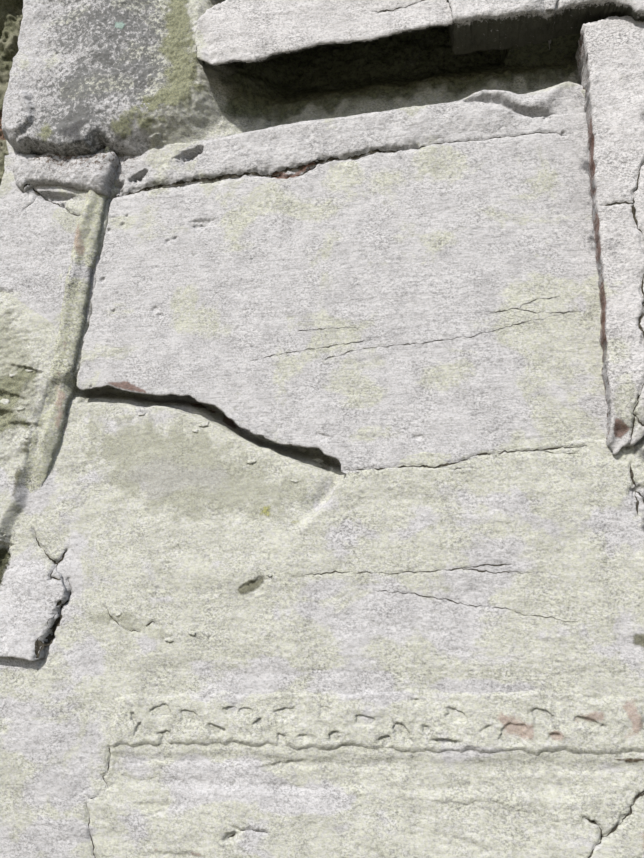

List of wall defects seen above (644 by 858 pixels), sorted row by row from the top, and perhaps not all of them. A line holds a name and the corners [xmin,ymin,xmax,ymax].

crack [116,132,562,197]
crack [603,162,644,245]
crack [250,296,577,361]
crack [636,274,644,338]
crack [342,445,587,471]
crack [627,384,644,515]
peeling [0,554,70,661]
crack [293,564,573,622]
crack [585,791,644,858]